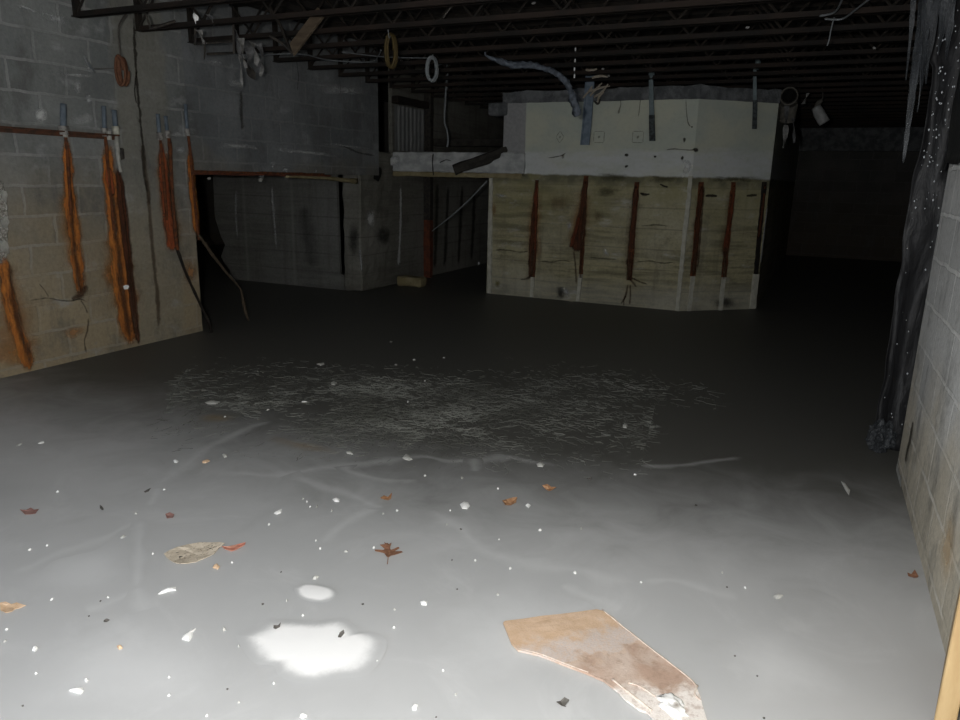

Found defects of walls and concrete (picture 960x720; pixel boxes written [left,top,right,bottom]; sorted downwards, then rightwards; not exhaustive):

rust [63,145,88,300]
rust [102,149,140,343]
rust [158,148,179,250]
rust [521,183,538,280]
rust [570,181,599,282]
rust [621,186,646,305]
rust [692,187,704,275]
rust [722,186,736,277]
rust [0,257,33,369]
crack [35,285,89,351]